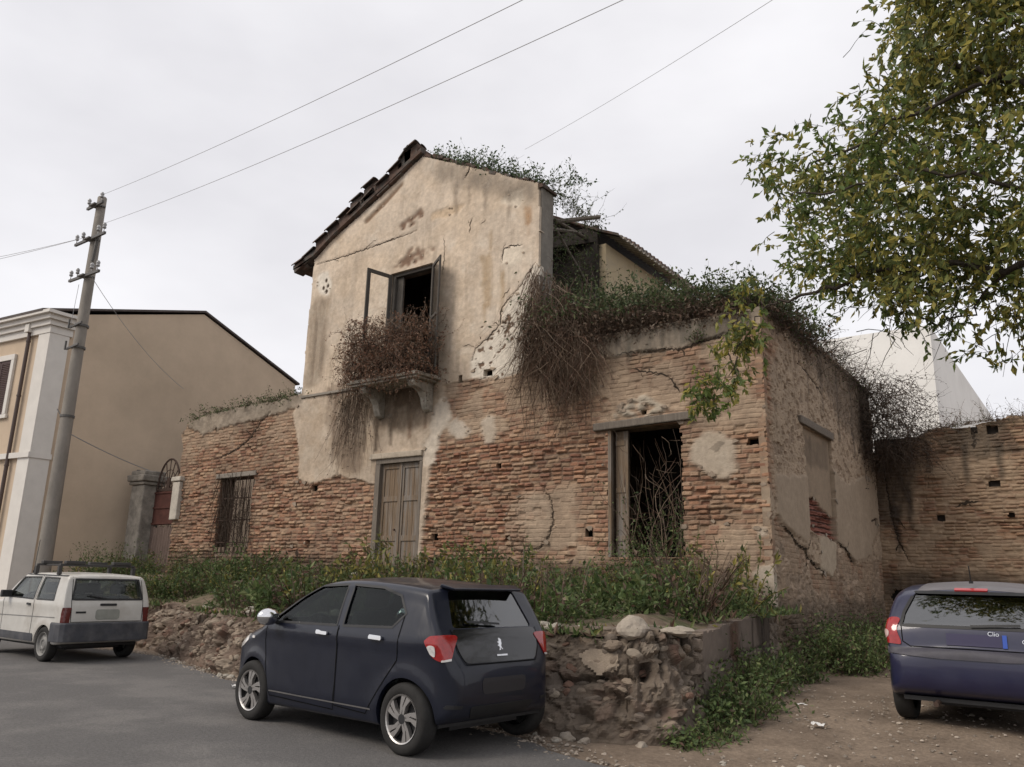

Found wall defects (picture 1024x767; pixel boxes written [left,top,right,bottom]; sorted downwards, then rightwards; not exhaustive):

crack [324,232,412,263]
crack [615,332,739,392]
spalling [165,389,376,579]
spalling [421,265,887,665]
crack [513,494,554,552]
crack [783,526,854,572]